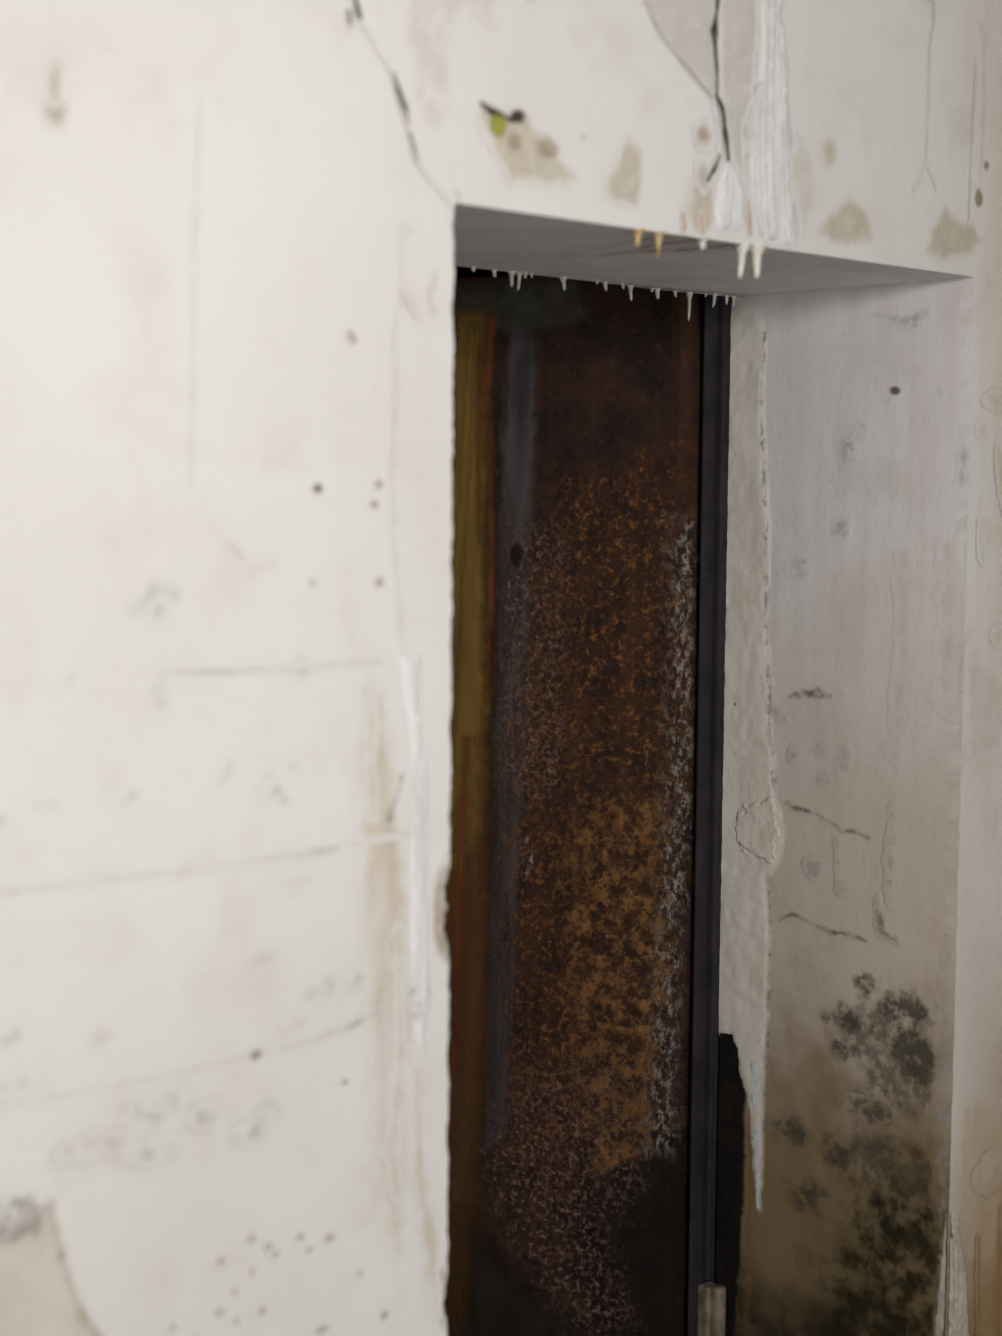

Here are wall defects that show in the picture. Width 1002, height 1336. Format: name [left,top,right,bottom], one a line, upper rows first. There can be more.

crack [346,0,460,207]
peeling [642,0,761,194]
crack [705,0,732,185]
leakage [713,0,840,249]
corrosion [449,308,496,1069]
peeling [716,299,788,1336]
peeling [0,1193,105,1336]
leakage [763,946,1002,1336]